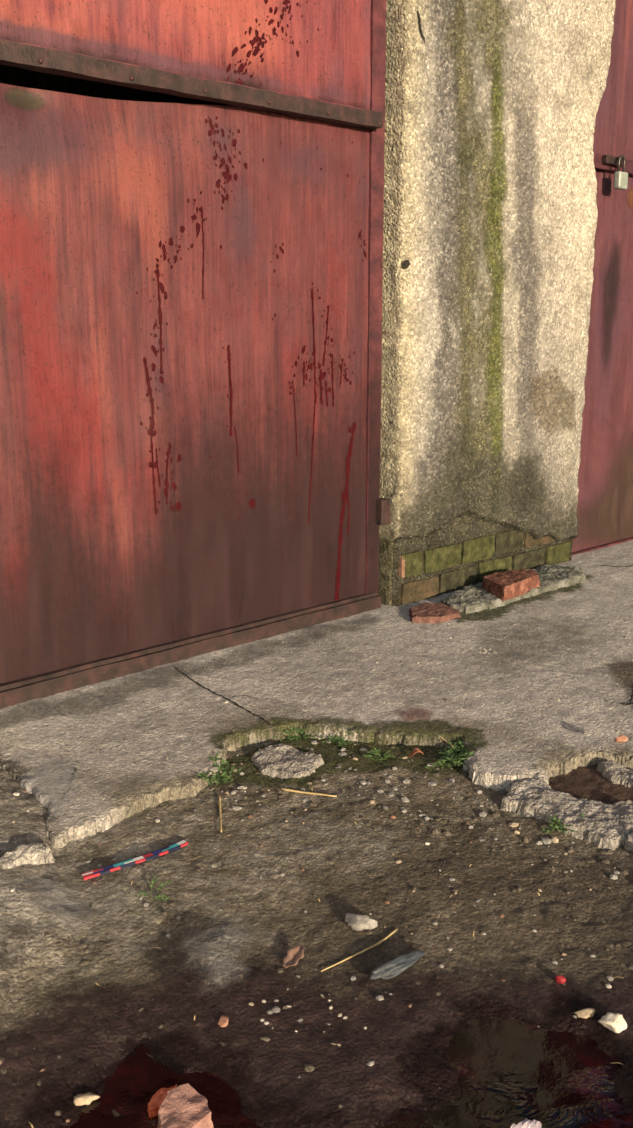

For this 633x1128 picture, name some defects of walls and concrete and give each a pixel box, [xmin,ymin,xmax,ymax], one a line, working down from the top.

water stain [289,282,355,538]
water stain [335,380,382,601]
spalling [392,516,578,606]
water stain [393,0,578,590]